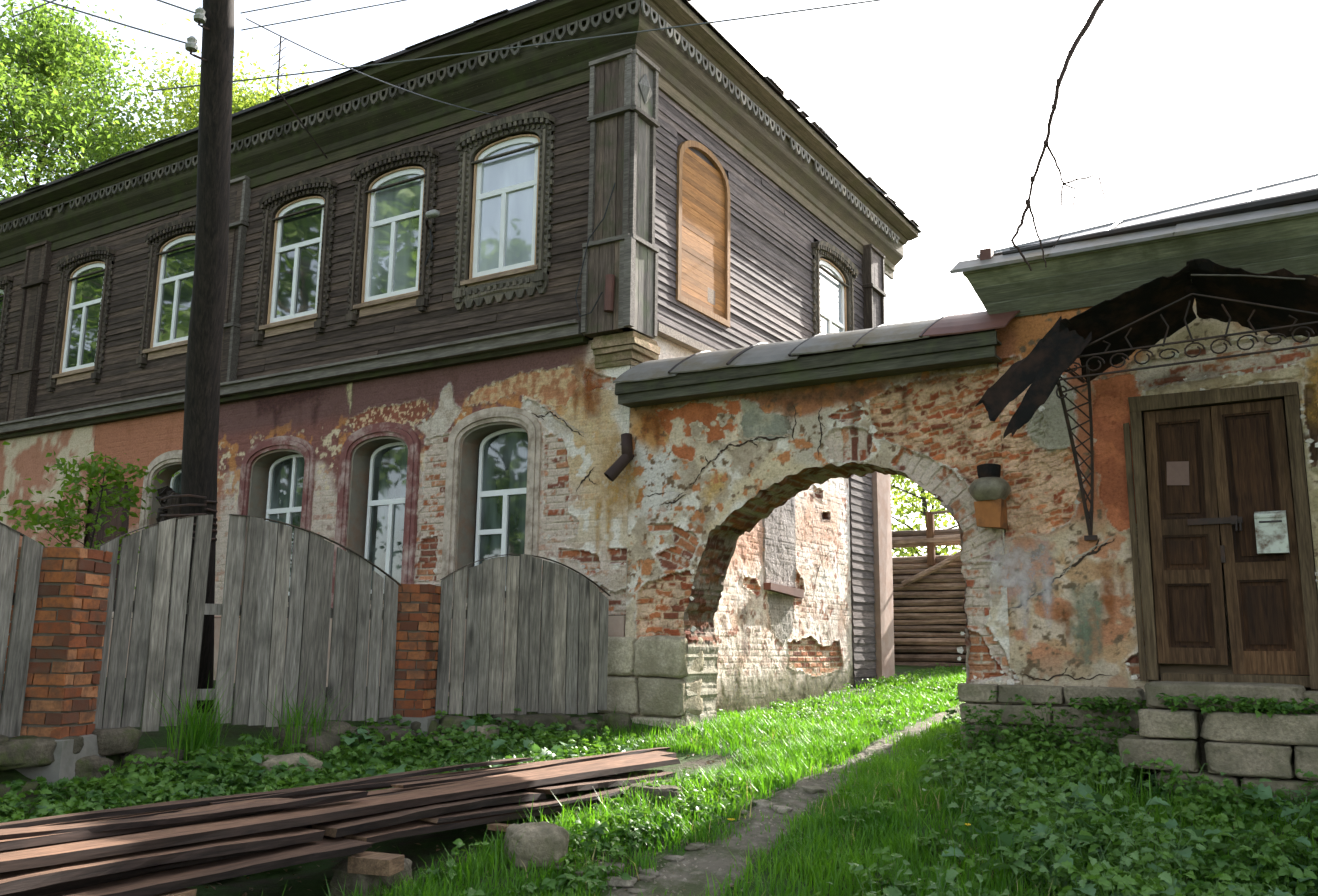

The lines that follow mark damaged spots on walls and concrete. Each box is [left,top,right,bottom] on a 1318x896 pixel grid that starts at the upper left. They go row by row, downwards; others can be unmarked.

peeling [655,400,756,462]
crack [644,401,826,505]
spalling [347,366,699,639]
spalling [813,484,831,520]
spalling [824,336,1318,685]
spalling [742,576,761,596]
spalling [793,569,805,616]
damp [995,547,1051,605]
spalling [787,635,844,676]